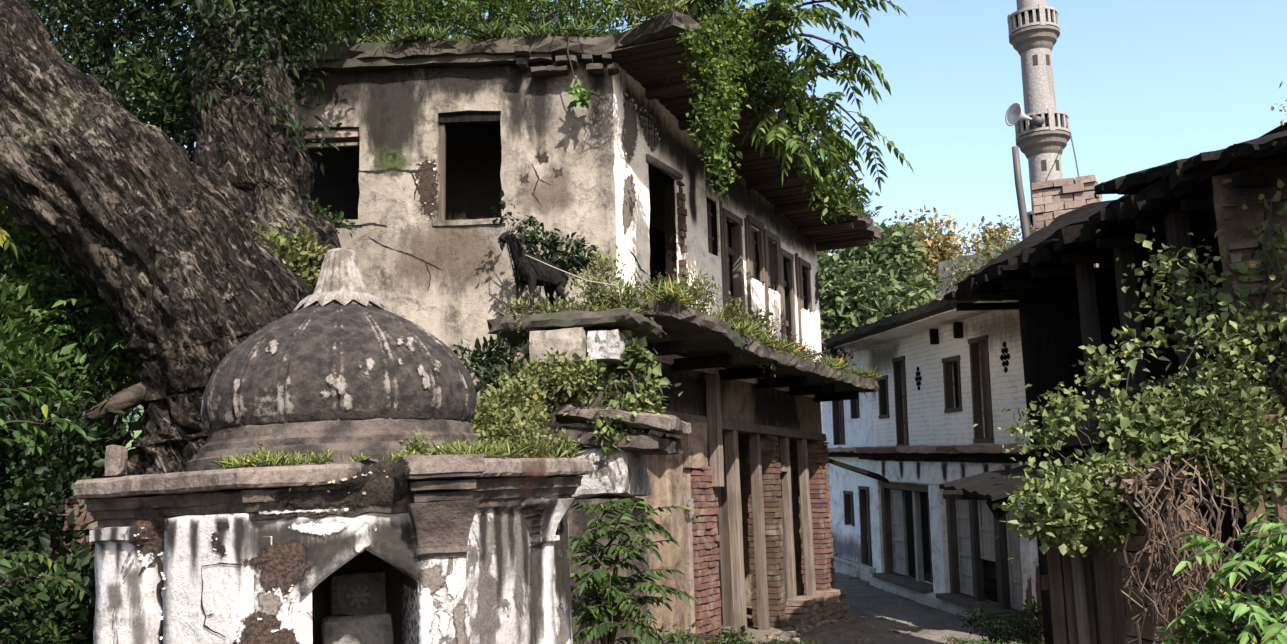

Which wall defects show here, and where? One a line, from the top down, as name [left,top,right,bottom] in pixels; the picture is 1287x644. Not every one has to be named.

water stain [288,61,556,159]
flaking render [415,159,441,221]
peeling [621,91,660,235]
peeling [319,373,353,410]
peeling [396,335,441,390]
water stain [94,524,148,644]
crack [138,542,166,644]
water stain [167,519,199,562]
crack [201,559,276,637]
flaking render [231,470,388,644]
peeling [401,564,469,644]
water stain [470,496,576,644]